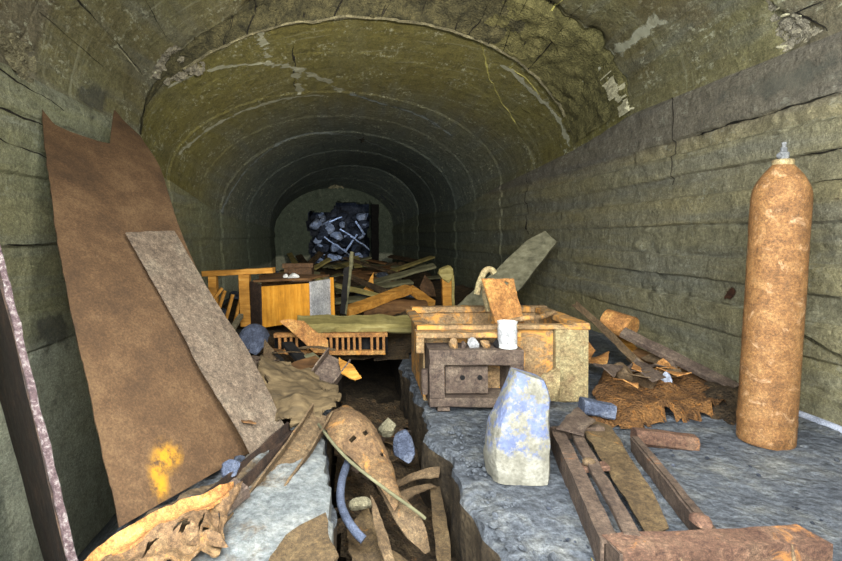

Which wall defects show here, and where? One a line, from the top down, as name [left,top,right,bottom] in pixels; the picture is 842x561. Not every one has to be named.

crack [77,0,144,76]
spalling [765,0,824,52]
crack [794,0,828,31]
crack [0,68,64,111]
spalling [139,0,634,145]
crack [0,107,42,125]
crack [804,335,842,358]